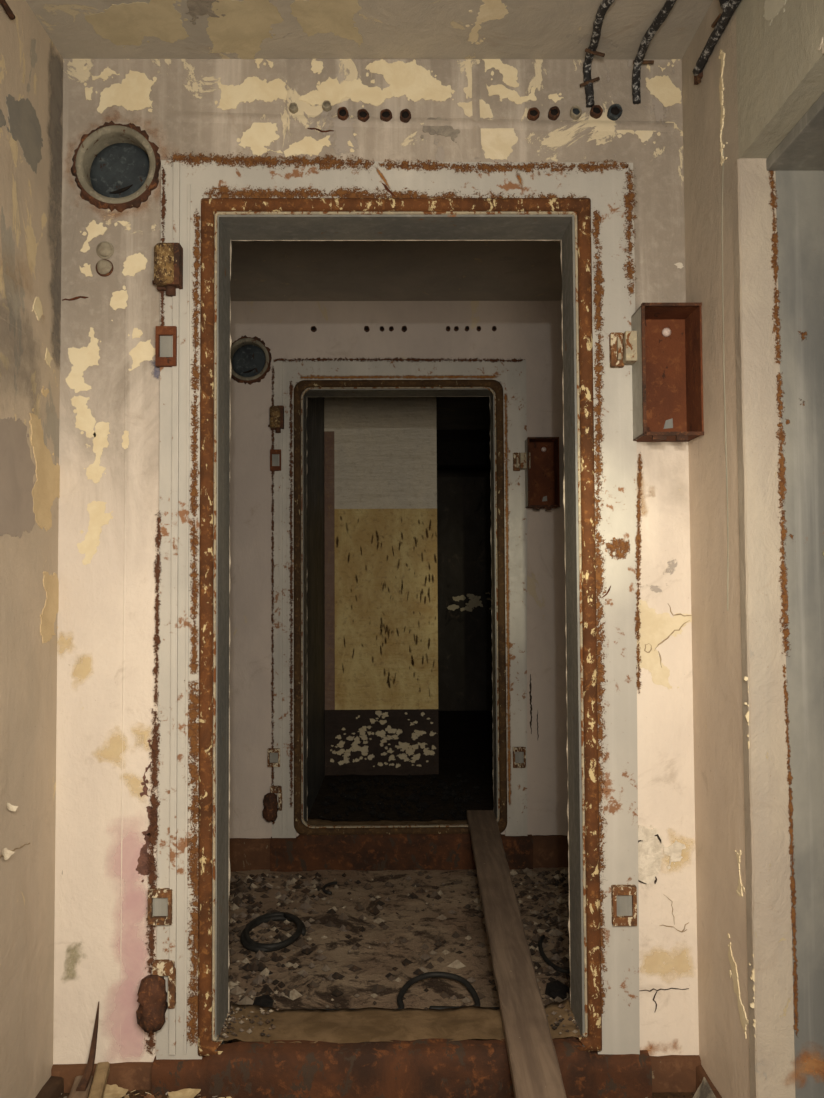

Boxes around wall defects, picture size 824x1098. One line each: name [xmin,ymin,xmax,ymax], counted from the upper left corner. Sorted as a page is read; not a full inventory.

peeling [83,66,157,114]
peeling [215,59,563,160]
peeling [110,253,148,321]
peeling [65,327,129,483]
spalling [0,408,60,538]
rust [161,151,643,1056]
rust [768,170,799,1035]
rust [145,511,163,889]
rust [145,907,156,975]
crack [638,877,689,932]
rust [144,1032,155,1054]
crack [639,988,689,1011]